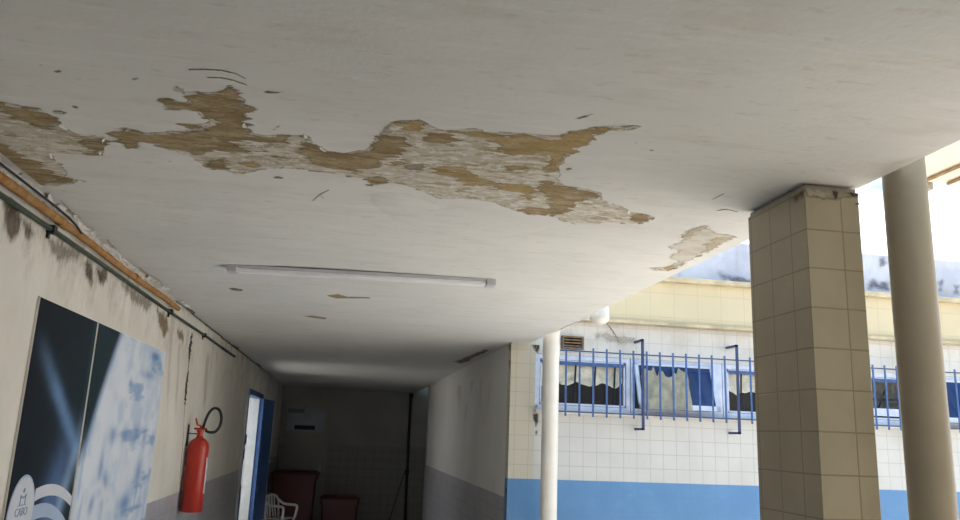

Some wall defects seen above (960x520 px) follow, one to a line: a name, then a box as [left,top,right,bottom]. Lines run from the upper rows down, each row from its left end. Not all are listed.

peeling [0,85,655,307]
water stain [51,240,107,284]
peeling [650,226,737,271]
water stain [125,287,184,340]
crack [176,301,271,480]